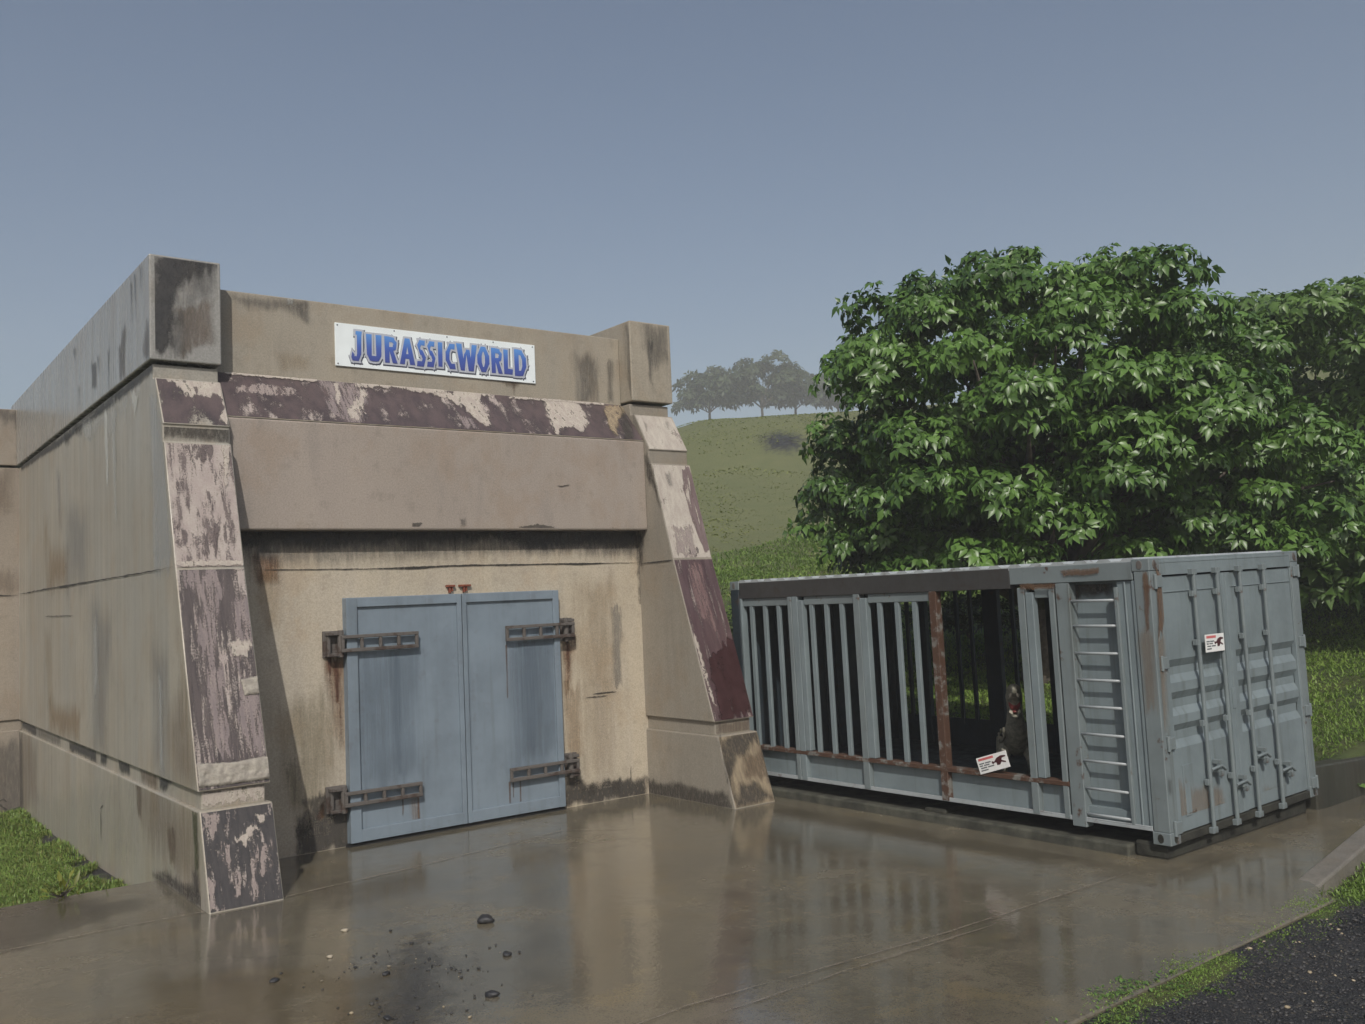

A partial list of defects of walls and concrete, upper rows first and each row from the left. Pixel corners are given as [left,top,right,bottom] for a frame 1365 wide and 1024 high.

water stain [21,257,214,486]
peeling [156,372,775,808]
peeling [165,443,283,913]
corrosion [326,658,343,726]
corrosion [564,640,575,685]
water stain [566,737,732,807]
water stain [296,795,348,855]